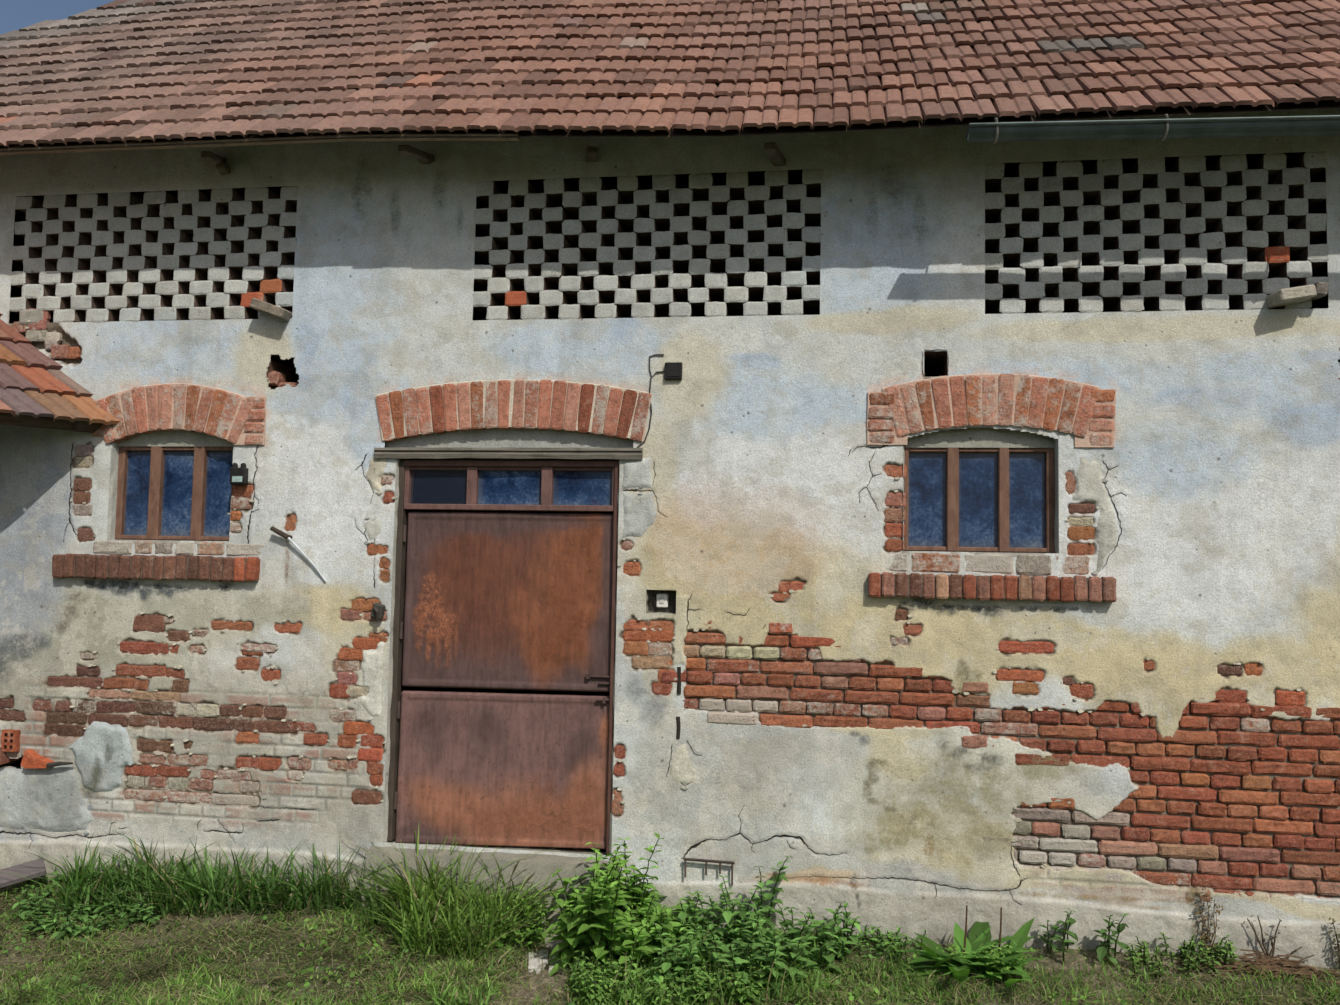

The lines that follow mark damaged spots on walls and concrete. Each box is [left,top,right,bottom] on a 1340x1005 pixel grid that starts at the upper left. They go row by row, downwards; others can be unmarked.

spalling [266,354,299,389]
flaking render [70,445,95,542]
flaking render [381,475,396,503]
crack [848,445,888,511]
flaking render [884,464,907,553]
flaking render [367,544,390,582]
flaking render [618,538,641,576]
rust [414,575,456,659]
flaking render [0,597,388,807]
flaking render [611,745,626,815]
flaking render [622,588,1340,902]
crack [681,806,1027,905]